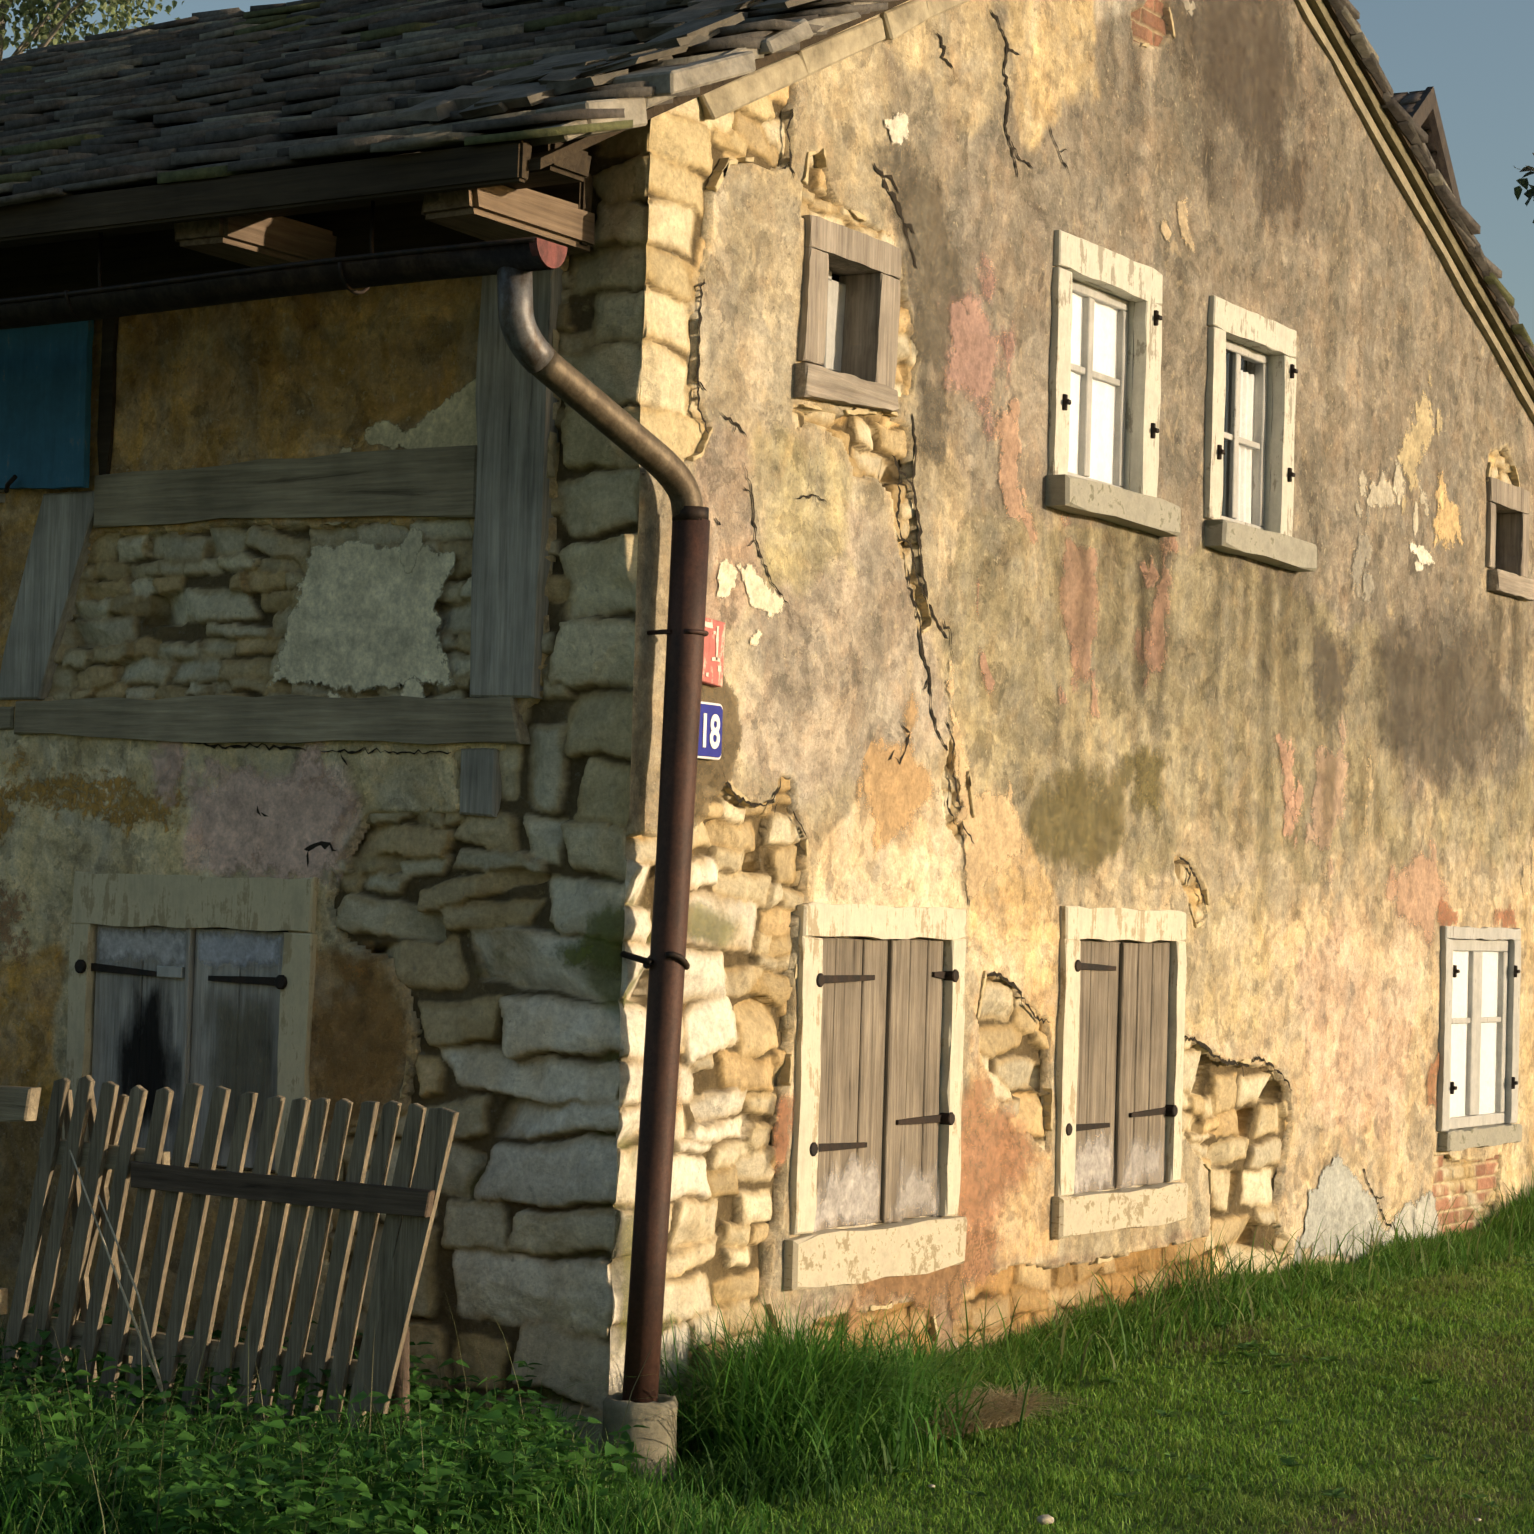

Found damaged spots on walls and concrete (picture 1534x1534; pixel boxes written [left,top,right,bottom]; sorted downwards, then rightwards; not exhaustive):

crack [781,109,795,178]
crack [874,163,917,268]
crack [991,10,1070,178]
flaking render [0,399,657,1467]
flaking render [658,777,809,1452]
crack [697,279,790,607]
flaking render [792,308,932,633]
crack [889,414,974,843]
flaking render [976,971,1053,1150]
flaking render [810,1038,1294,1362]
water stain [1132,746,1165,813]
peeling [1350,375,1463,602]